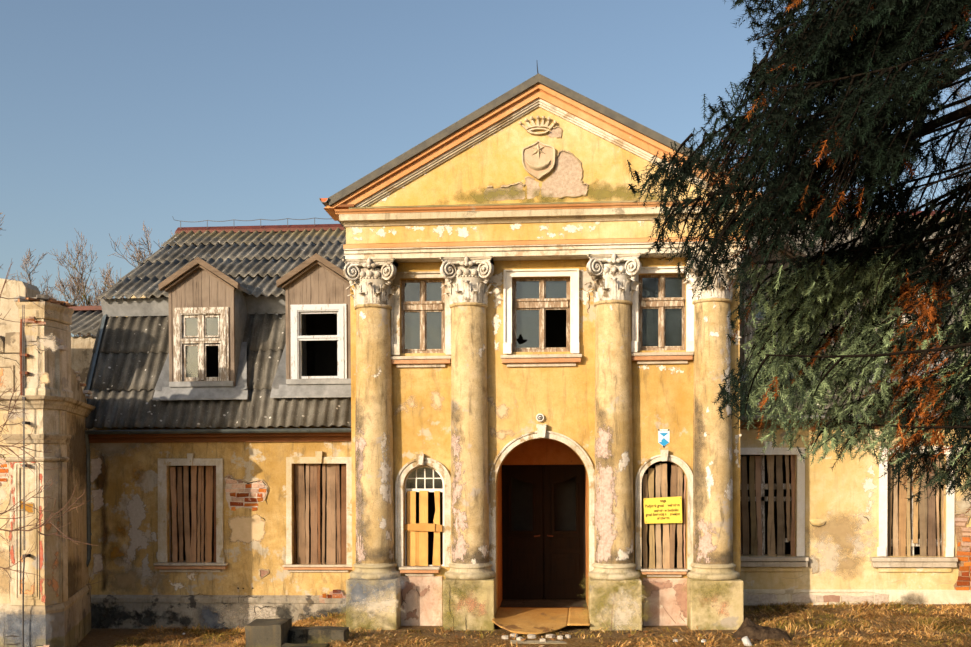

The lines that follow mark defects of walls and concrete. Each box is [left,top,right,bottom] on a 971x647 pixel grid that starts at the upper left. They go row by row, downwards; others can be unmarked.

flaking render [484,150,589,201]
leakage [587,185,659,201]
peeling [350,225,477,240]
peeling [537,221,600,239]
flaking render [223,474,269,511]
peeling [594,425,634,563]
peeling [0,455,59,603]
flaking render [123,493,158,577]
flaking render [954,495,971,590]
leakage [91,603,262,629]
flaking render [401,582,430,620]